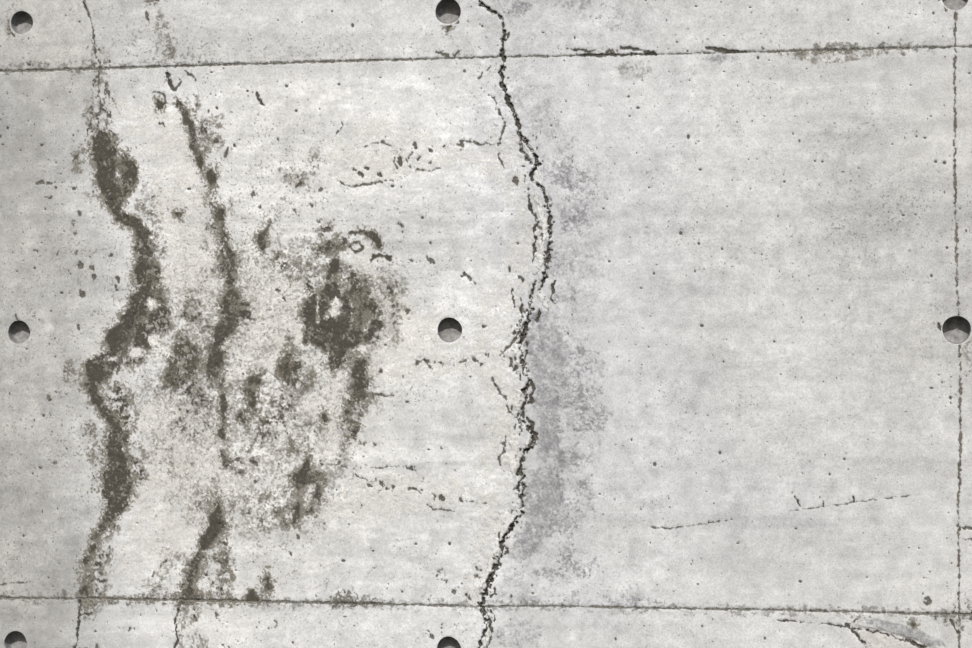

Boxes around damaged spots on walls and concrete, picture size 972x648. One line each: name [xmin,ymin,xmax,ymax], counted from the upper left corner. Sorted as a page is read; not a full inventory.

crack [83,1,97,58]
leakage [63,40,407,611]
crack [465,0,556,648]
crack [651,519,733,529]
crack [794,495,908,511]
crack [73,599,93,648]
crack [174,609,197,648]